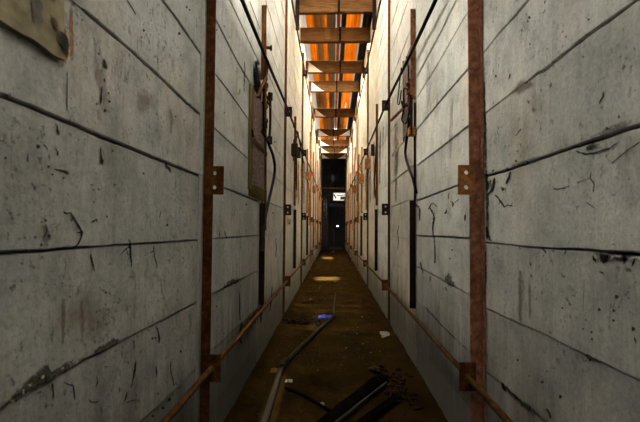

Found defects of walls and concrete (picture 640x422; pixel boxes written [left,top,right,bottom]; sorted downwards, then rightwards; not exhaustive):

crack [576,142,640,164]
crack [486,160,517,208]
crack [63,211,95,271]
crack [428,194,466,263]
spalling [94,339,119,355]
spalling [1,360,80,408]